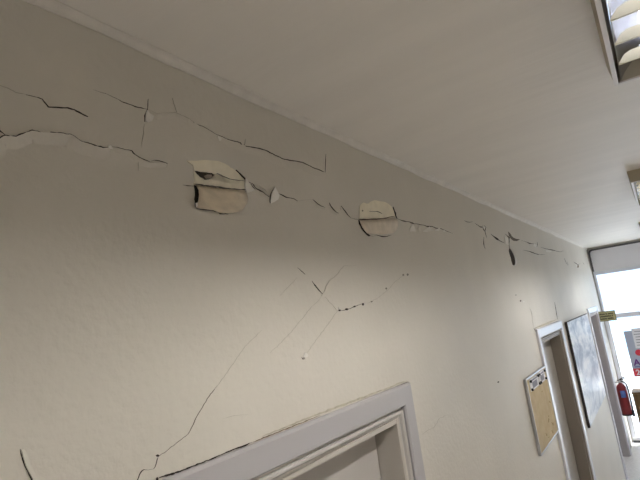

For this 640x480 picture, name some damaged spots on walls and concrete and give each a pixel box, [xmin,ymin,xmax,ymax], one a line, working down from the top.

crack [0,85,88,117]
crack [0,128,168,170]
peeling [186,160,248,214]
crack [245,178,359,220]
peeling [358,200,398,237]
crack [466,221,504,247]
crack [270,266,344,360]
crack [137,330,406,480]
crack [20,449,38,480]